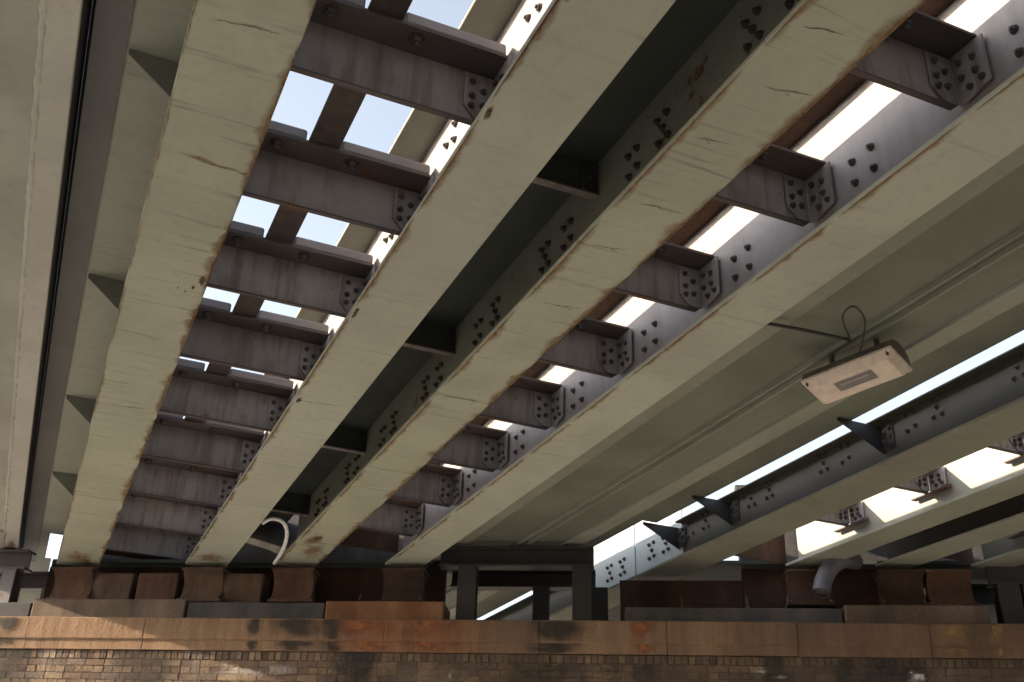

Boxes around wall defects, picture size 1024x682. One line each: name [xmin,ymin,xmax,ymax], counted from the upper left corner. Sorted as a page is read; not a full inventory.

crack [218,20,278,34]
corrosion [194,48,299,202]
corrosion [177,219,233,293]
corrosion [58,370,175,564]
damp [0,617,28,682]
damp [247,619,259,650]
damp [279,619,371,682]
damp [525,621,579,682]
damp [866,658,924,682]